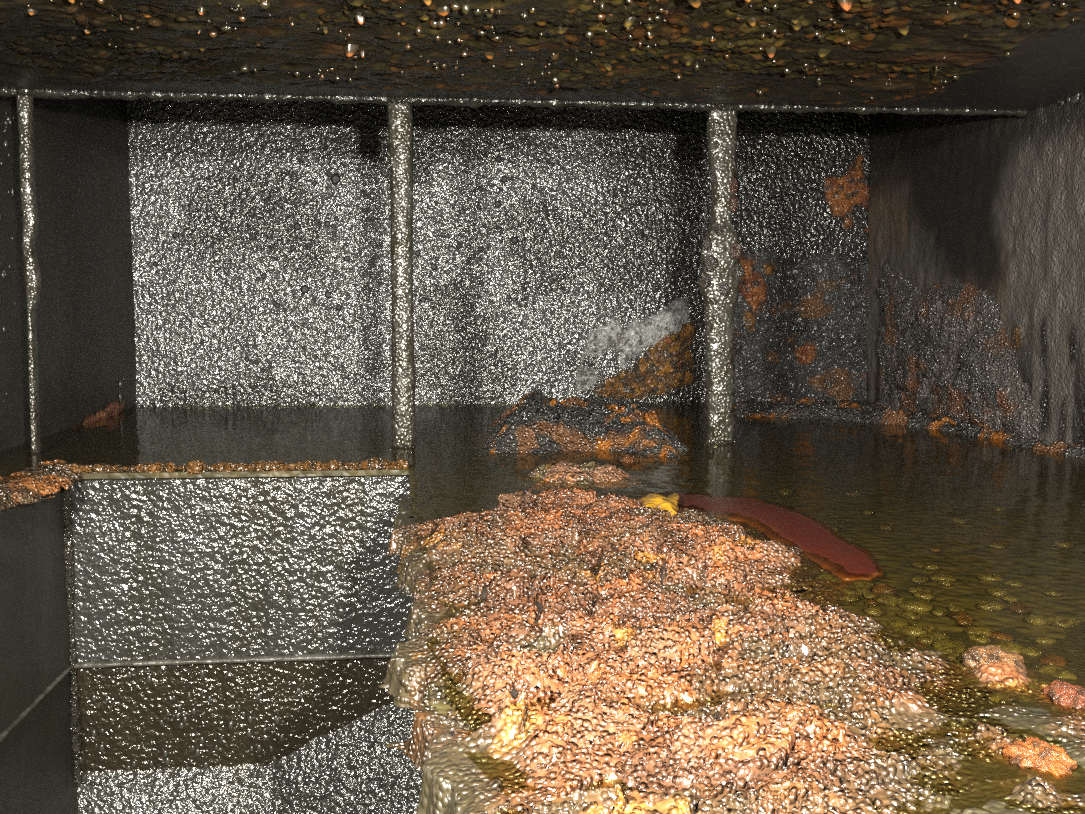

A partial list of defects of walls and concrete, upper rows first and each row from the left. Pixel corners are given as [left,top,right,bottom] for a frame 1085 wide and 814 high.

corrosion [823,155,869,228]
corrosion [739,256,777,331]
corrosion [472,322,698,491]
corrosion [788,338,818,365]
leakage [1040,319,1066,440]
corrosion [0,457,409,513]